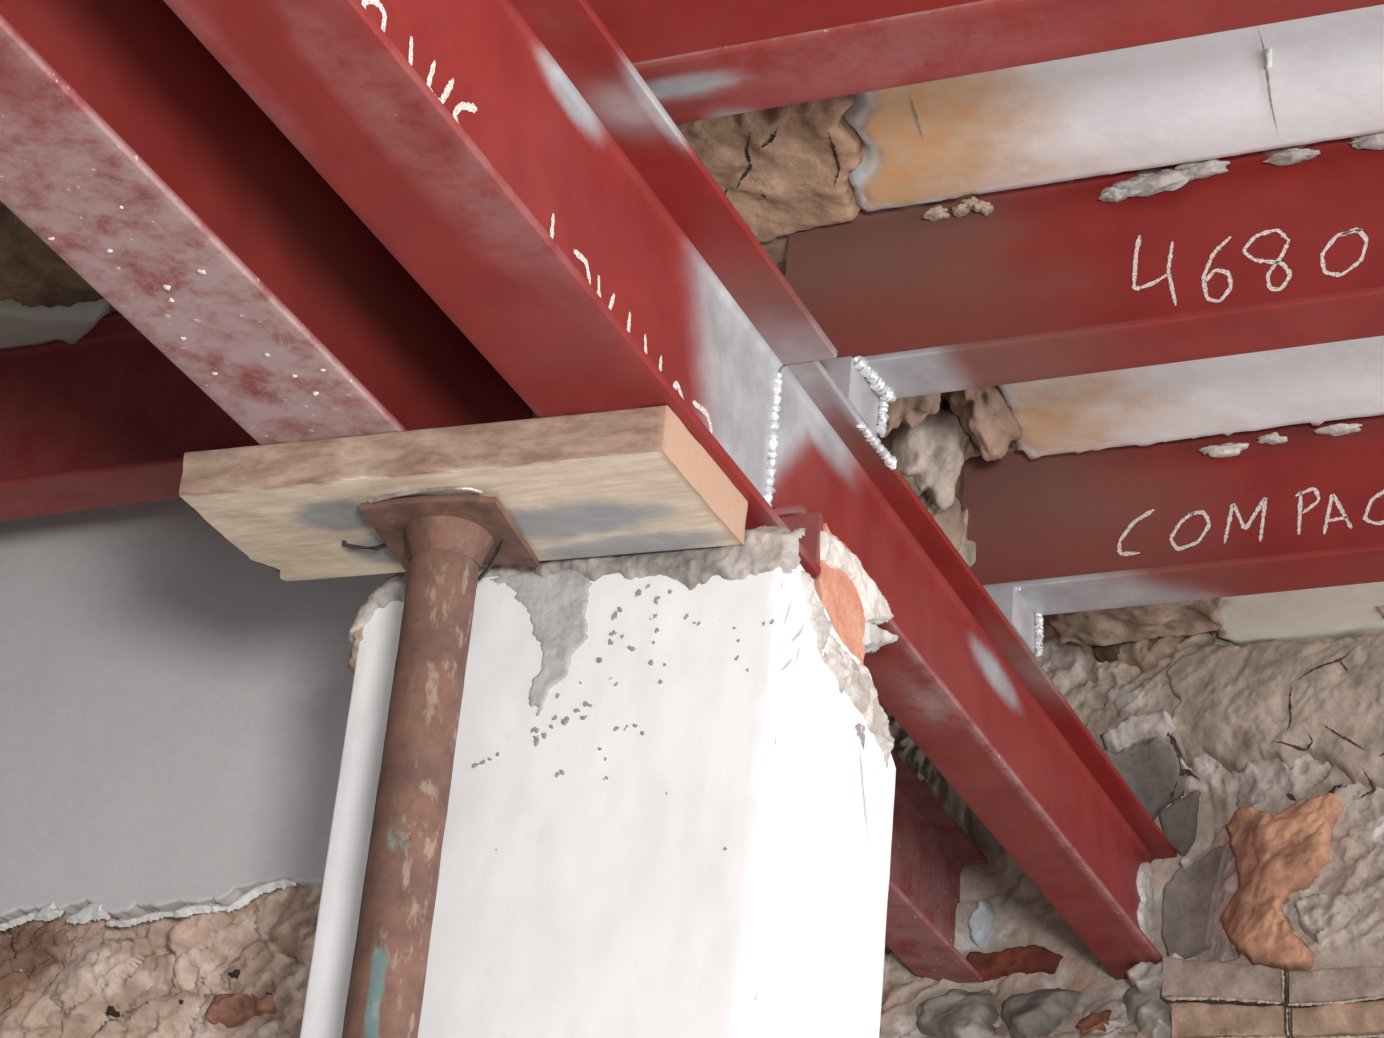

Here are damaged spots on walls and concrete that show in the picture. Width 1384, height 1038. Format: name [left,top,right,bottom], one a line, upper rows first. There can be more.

crack [1257,26,1278,131]
crack [725,126,779,199]
spalling [676,94,864,242]
crack [828,133,841,188]
rust [862,71,1009,206]
spalling [347,572,408,674]
spalling [479,525,899,768]
crack [1273,647,1384,799]
spalling [0,877,296,931]
flaking render [1162,793,1384,1038]
flaking render [205,992,277,1028]